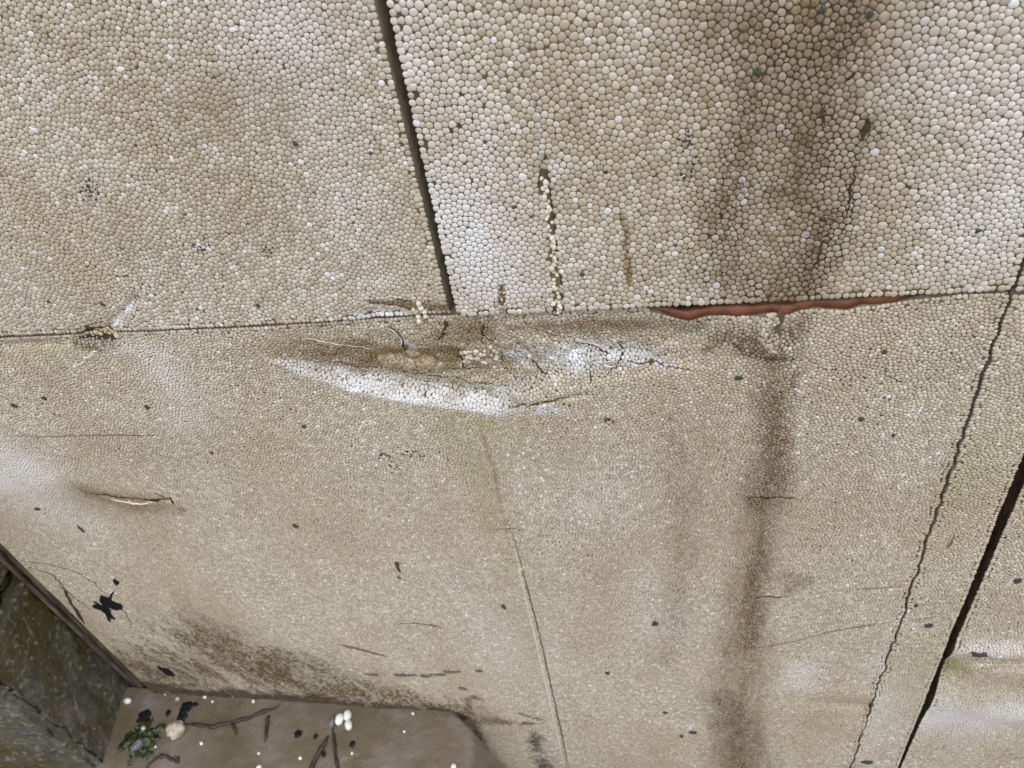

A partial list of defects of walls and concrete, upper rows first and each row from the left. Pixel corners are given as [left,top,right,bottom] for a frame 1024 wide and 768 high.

leakage [802,0,859,80]
leakage [860,117,872,141]
leakage [719,129,756,252]
leakage [846,163,857,219]
leakage [810,219,833,280]
leakage [735,262,793,361]
crack [280,318,697,409]
crack [85,492,181,510]